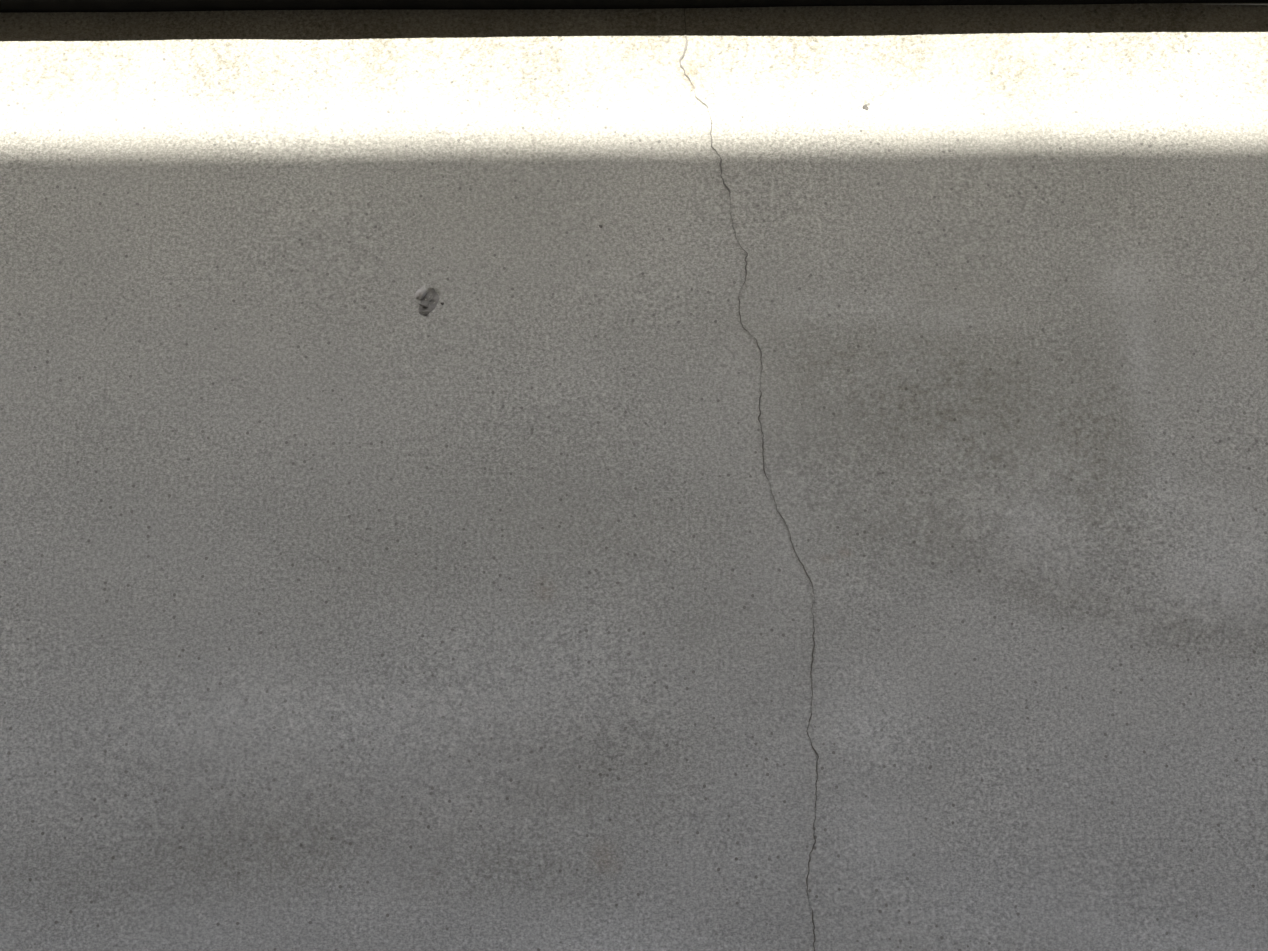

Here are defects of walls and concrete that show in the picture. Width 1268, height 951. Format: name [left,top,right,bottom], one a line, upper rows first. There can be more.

crack [679,8,819,951]